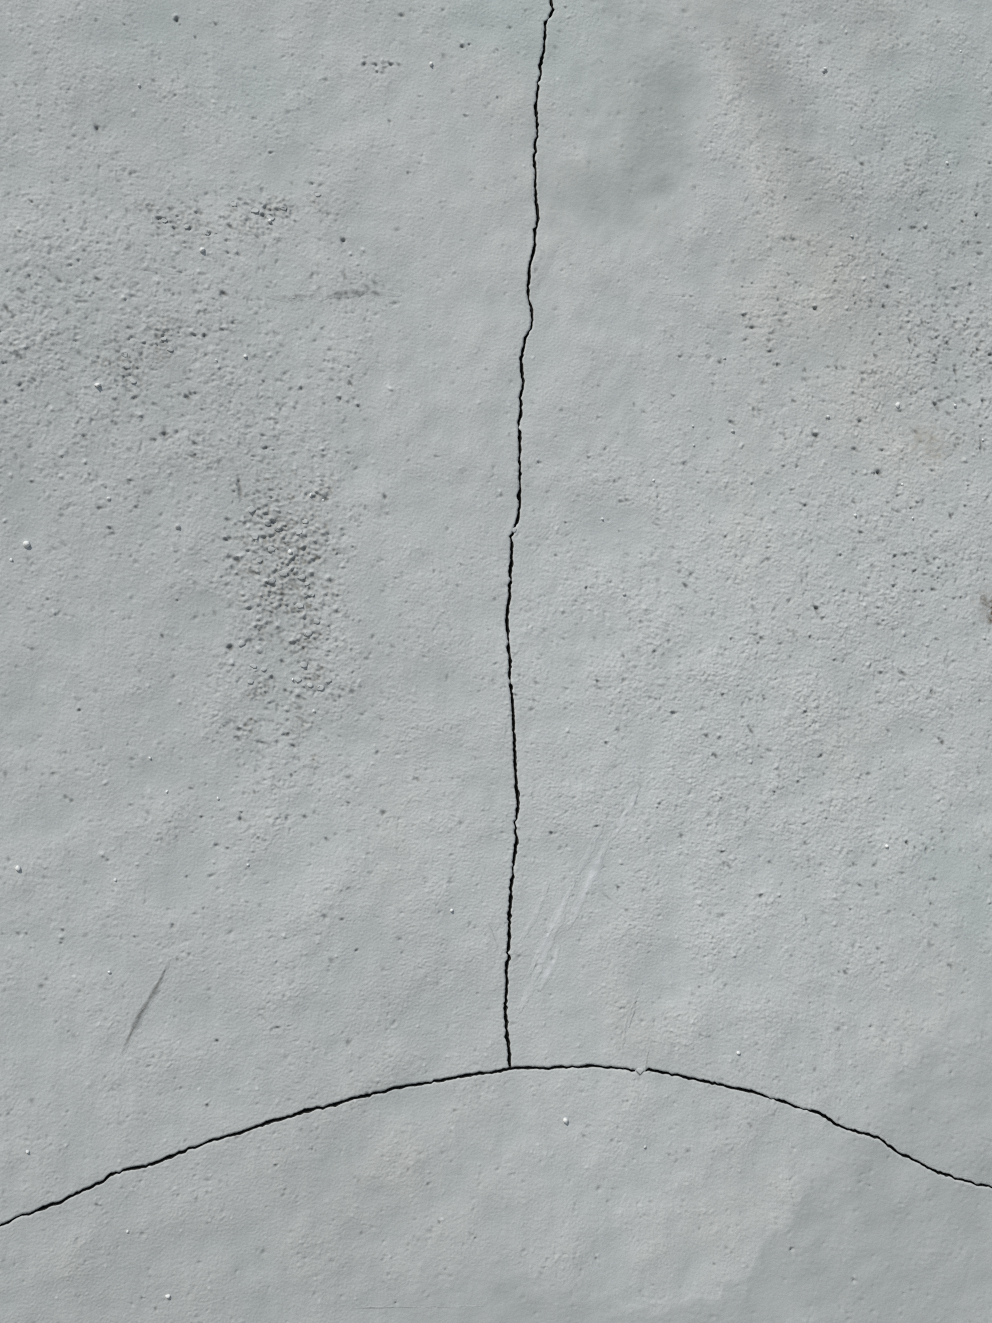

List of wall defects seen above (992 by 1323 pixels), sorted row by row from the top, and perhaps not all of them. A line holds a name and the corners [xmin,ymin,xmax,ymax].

crack [503,0,555,1066]
crack [0,1051,992,1226]